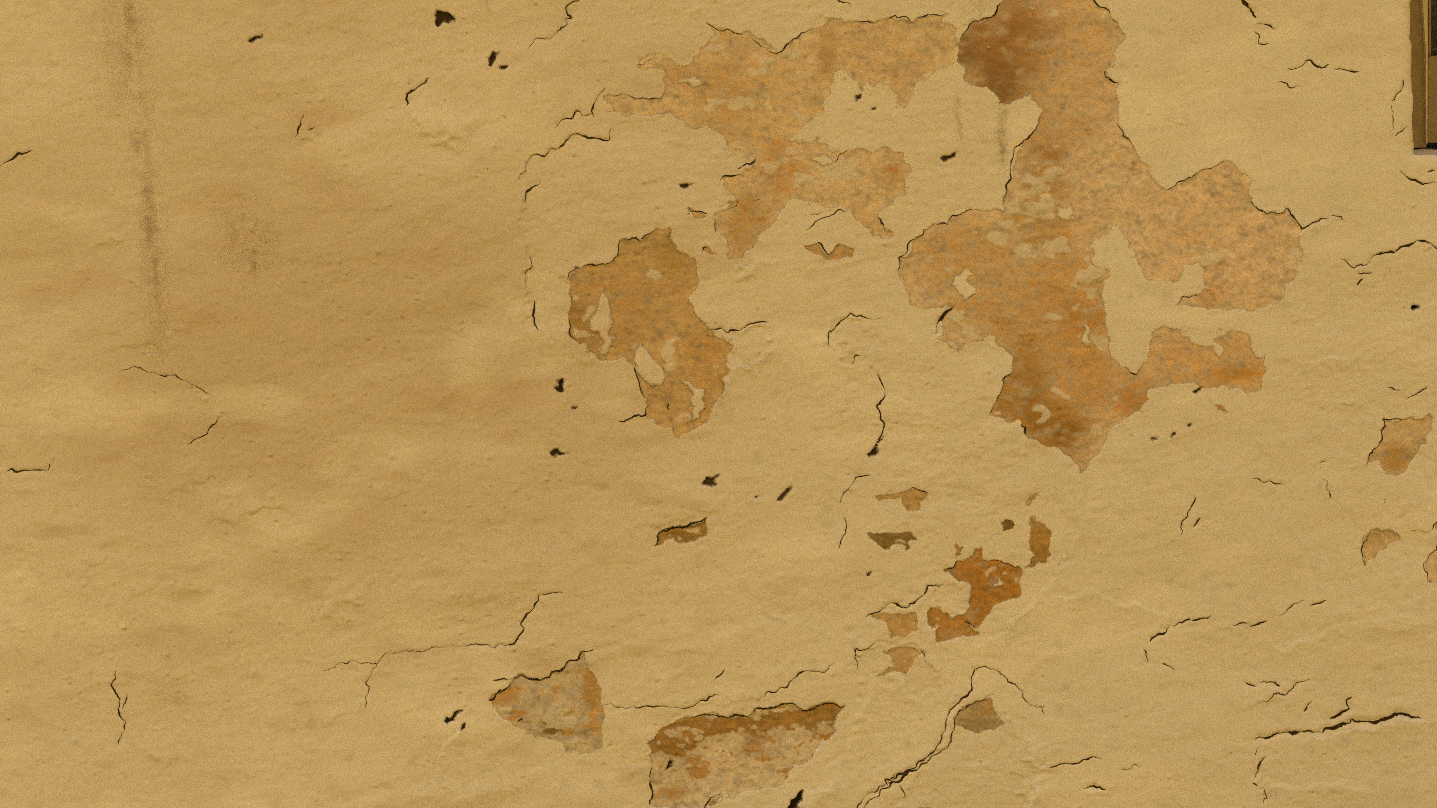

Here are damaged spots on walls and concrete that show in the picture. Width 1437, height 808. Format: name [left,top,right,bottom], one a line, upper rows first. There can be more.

crack [1241,0,1359,88]
crack [519,88,610,202]
peeling [568,0,1320,474]
peeling [1367,414,1433,475]
peeling [867,493,1051,676]
peeling [1361,522,1437,583]
peeling [488,649,605,753]
crack [601,668,725,709]
peeling [647,702,845,808]
crack [758,584,942,700]
crack [857,666,1044,808]
crack [1246,679,1420,802]